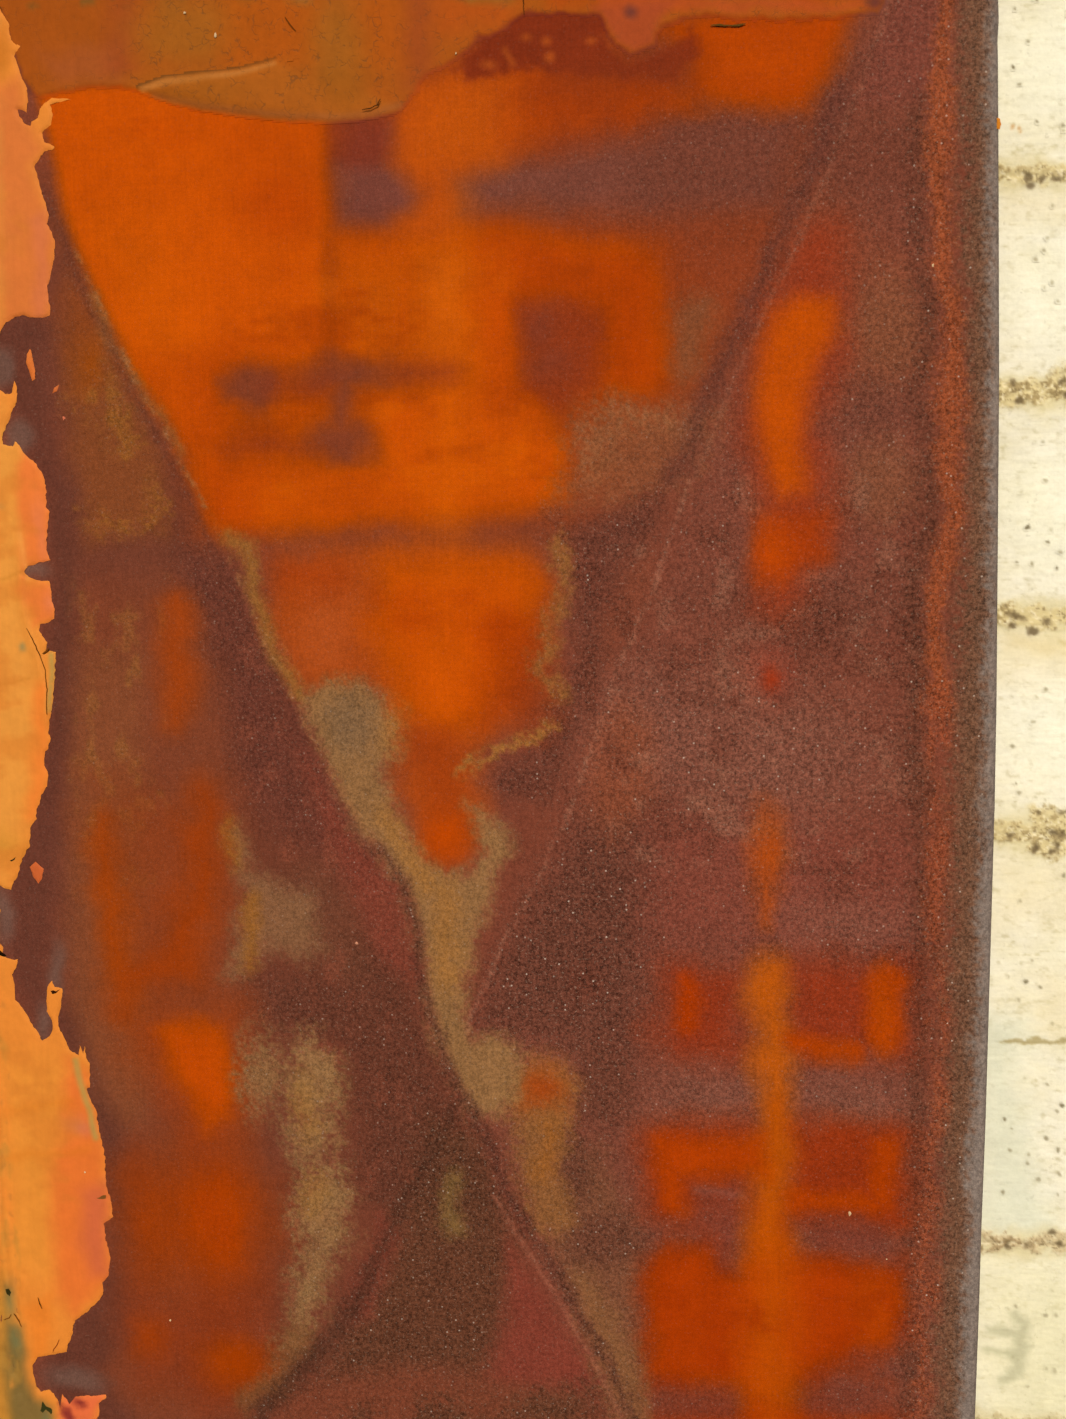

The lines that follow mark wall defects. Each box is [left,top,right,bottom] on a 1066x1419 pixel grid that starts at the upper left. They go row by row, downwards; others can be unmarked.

peeling [0,350,56,890]
peeling [0,944,113,1419]
corrosion [58,573,290,1419]
peeling [0,0,888,331]
corrosion [30,14,870,862]
corrosion [620,0,979,1419]